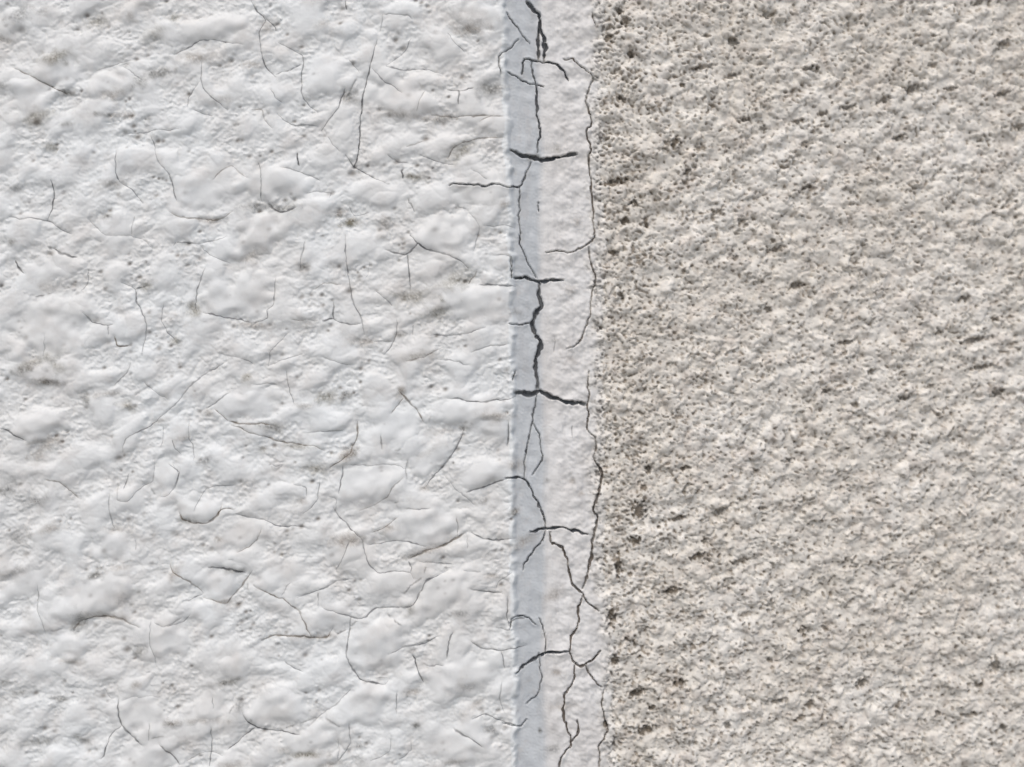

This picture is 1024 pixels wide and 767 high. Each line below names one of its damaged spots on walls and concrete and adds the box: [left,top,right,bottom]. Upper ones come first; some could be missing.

crack [339,56,425,174]
crack [453,3,609,766]
crack [214,567,317,638]